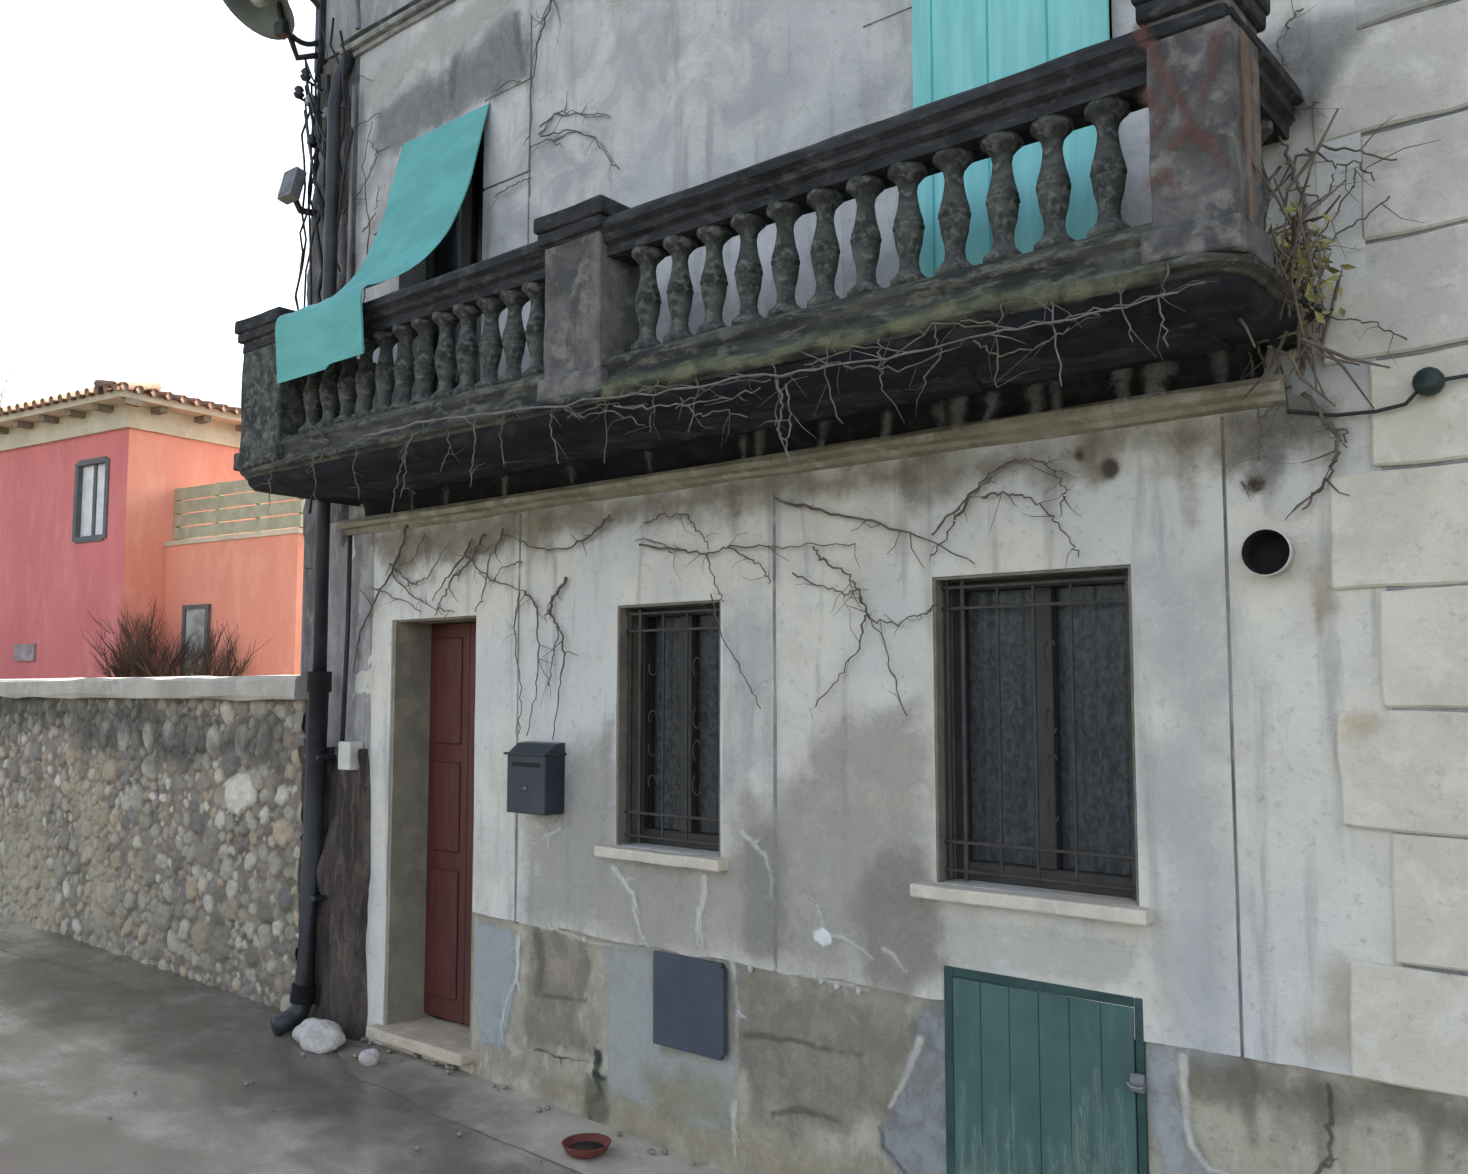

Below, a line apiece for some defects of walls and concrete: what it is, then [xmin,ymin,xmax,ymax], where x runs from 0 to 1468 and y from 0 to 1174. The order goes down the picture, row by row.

leakage [531,715,938,988]
crack [1179,1054,1229,1174]
crack [1314,1084,1335,1174]